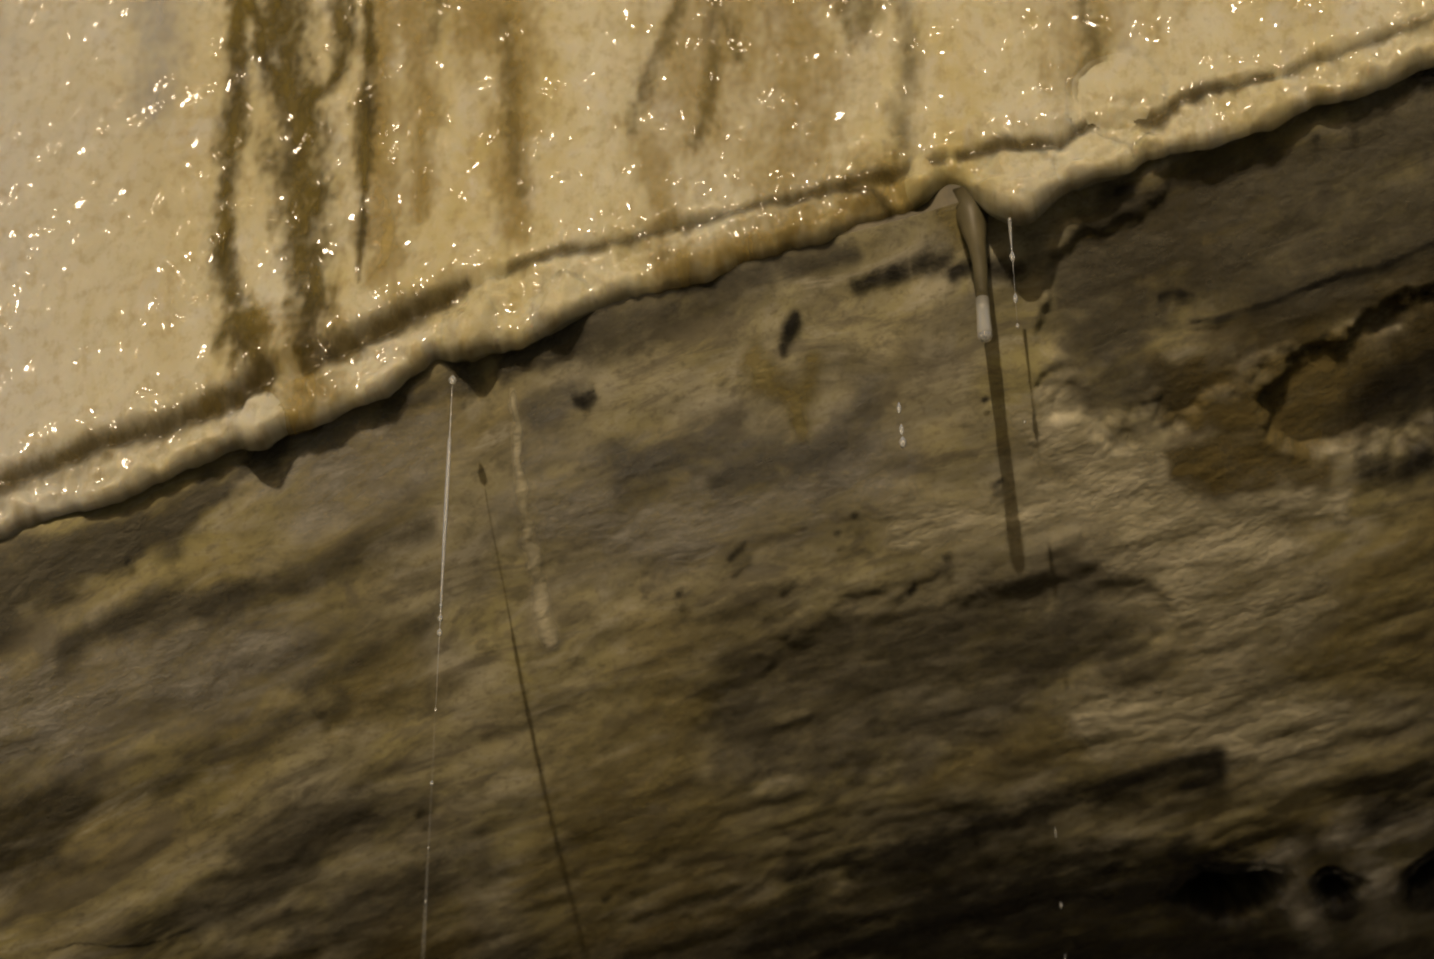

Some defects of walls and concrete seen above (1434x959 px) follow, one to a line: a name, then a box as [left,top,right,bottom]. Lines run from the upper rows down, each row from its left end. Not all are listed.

crack [1158,241,1434,324]
leakage [291,68,1434,959]
leakage [0,521,432,884]
leakage [137,789,429,943]